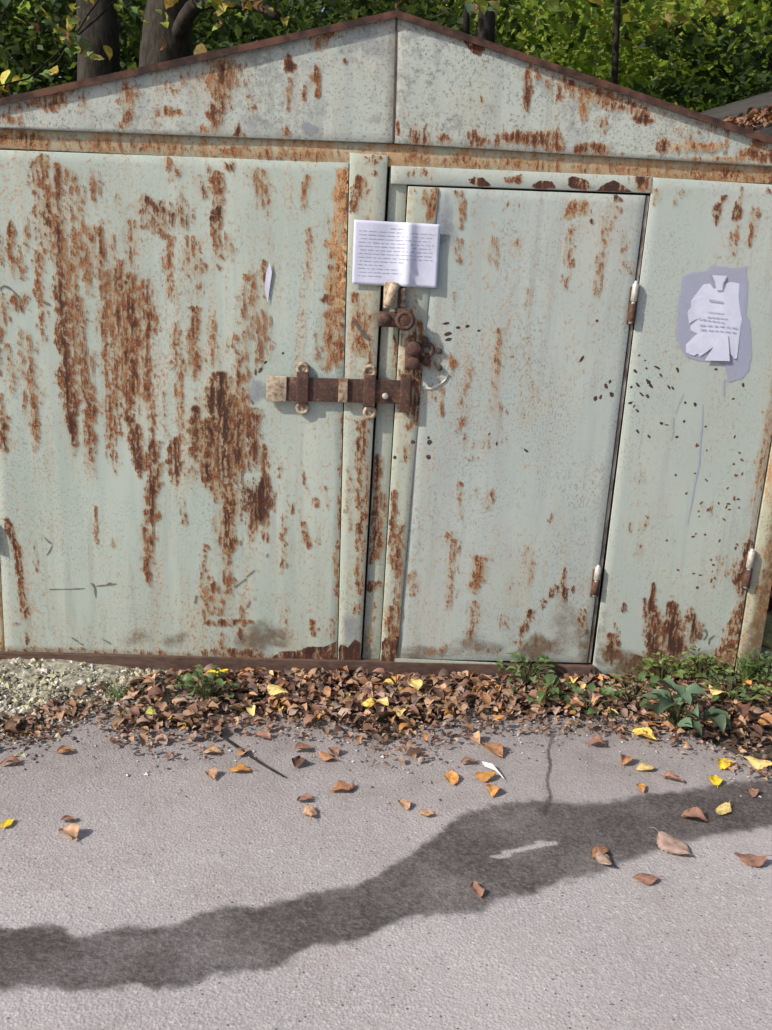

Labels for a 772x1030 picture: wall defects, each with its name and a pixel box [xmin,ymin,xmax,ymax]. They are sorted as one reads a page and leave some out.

corrosion [309,32,340,51]
corrosion [450,36,485,56]
corrosion [0,52,772,586]
corrosion [4,517,38,619]
corrosion [194,544,253,647]
corrosion [302,413,420,643]
corrosion [428,531,489,655]
corrosion [497,567,574,651]
corrosion [677,400,772,675]
crack [543,730,553,815]
damp [0,781,772,989]